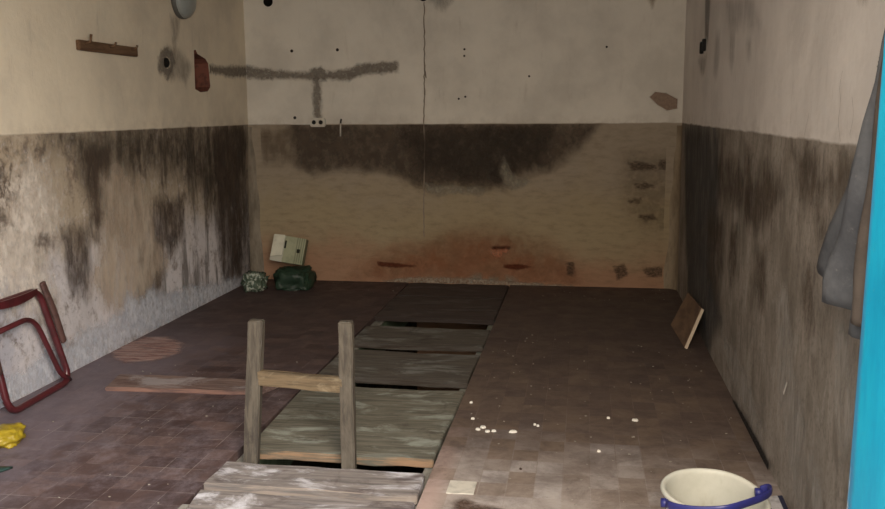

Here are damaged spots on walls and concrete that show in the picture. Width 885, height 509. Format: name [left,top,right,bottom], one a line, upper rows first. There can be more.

leakage [0,126,249,408]
leakage [292,124,594,194]
peeling [649,91,678,111]
leakage [685,130,777,343]